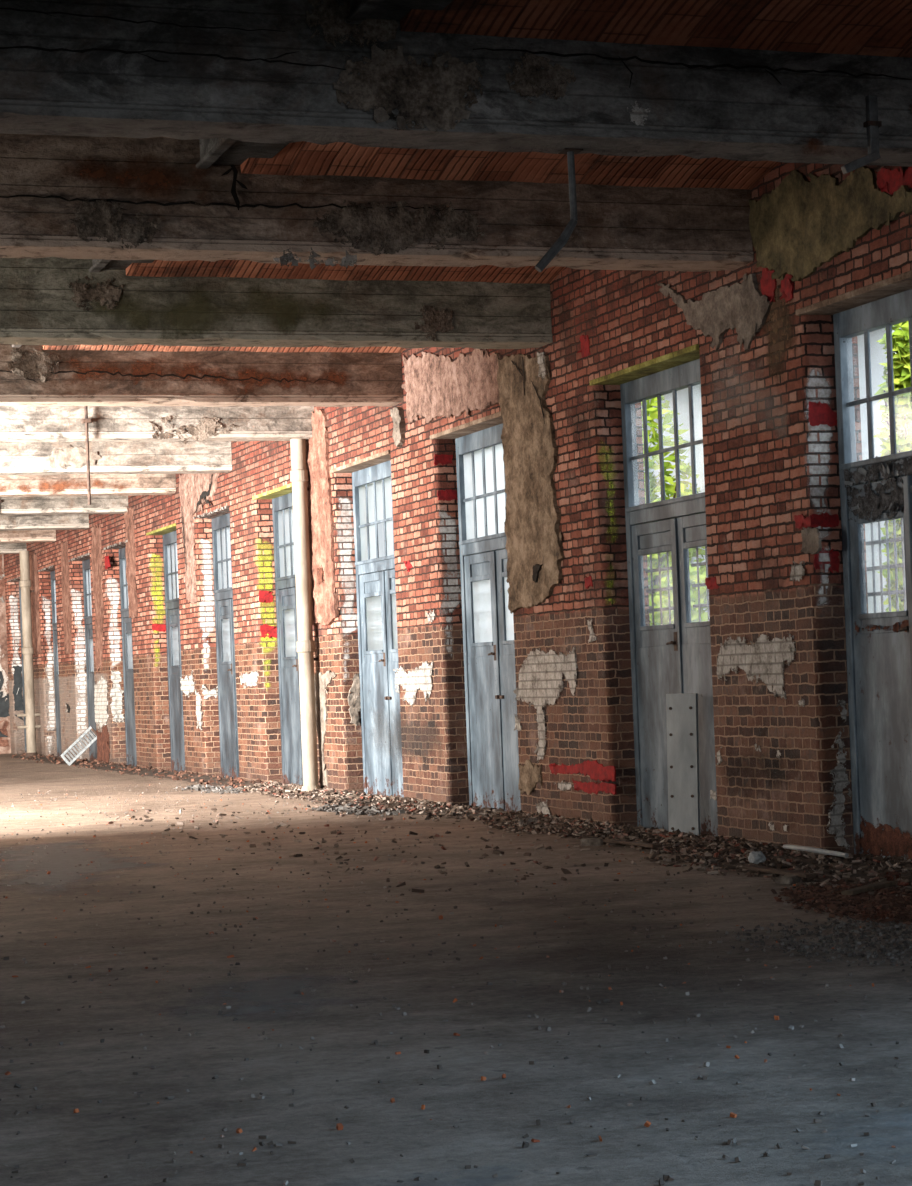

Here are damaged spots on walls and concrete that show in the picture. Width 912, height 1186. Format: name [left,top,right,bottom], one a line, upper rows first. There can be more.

crack [473,48,911,88]
crack [0,165,478,212]
spalling [875,166,912,195]
peeling [536,352,547,380]
peeling [844,456,912,522]
spalling [532,564,543,583]
rust [855,620,909,633]
peeling [0,645,8,700]
peeling [717,634,796,699]
spalling [0,720,11,747]
peeling [513,618,597,816]
rust [860,816,912,859]